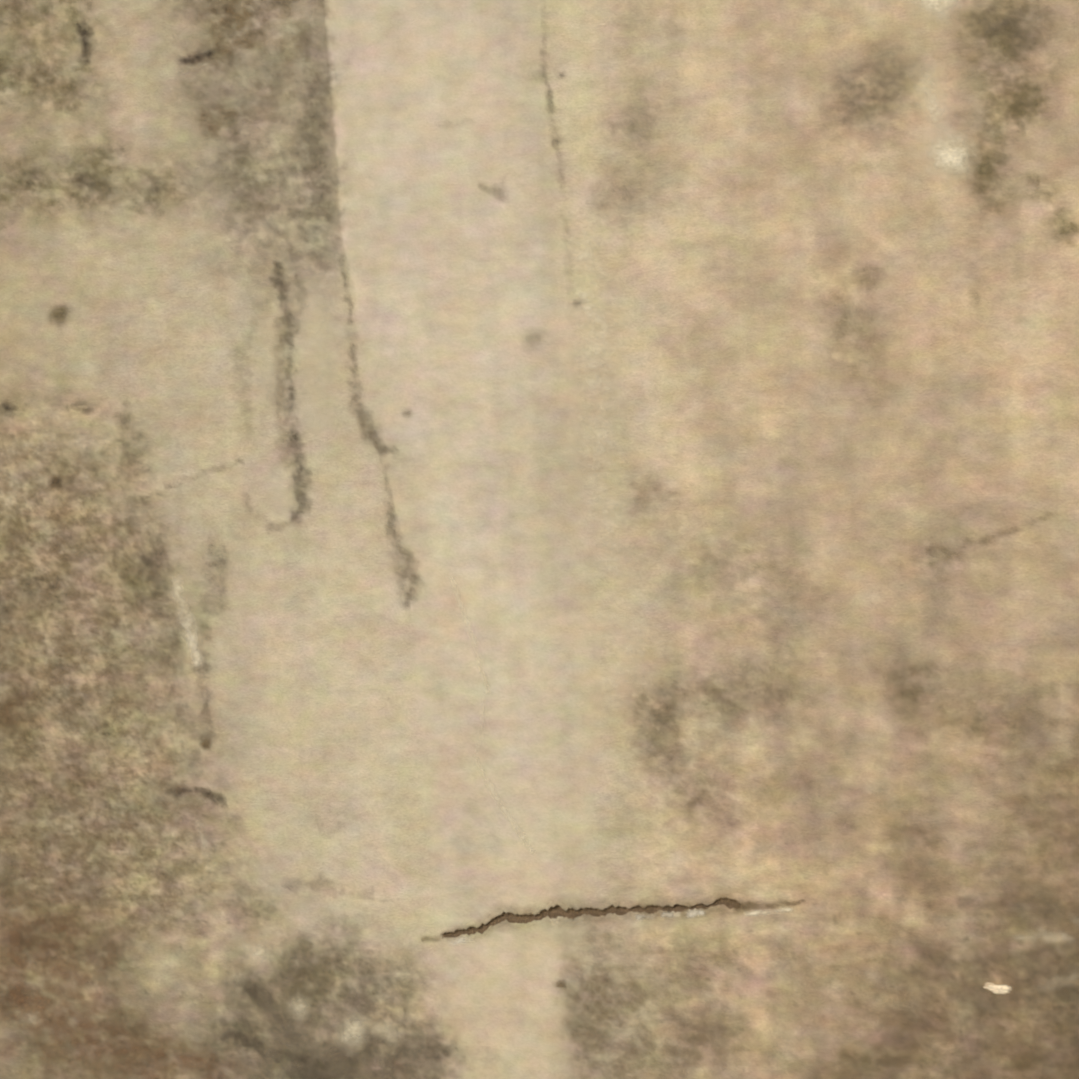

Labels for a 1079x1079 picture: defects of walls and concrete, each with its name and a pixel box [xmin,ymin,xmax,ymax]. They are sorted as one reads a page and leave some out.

water stain [175,581,200,666]
crack [440,891,799,943]
water stain [224,949,444,1079]